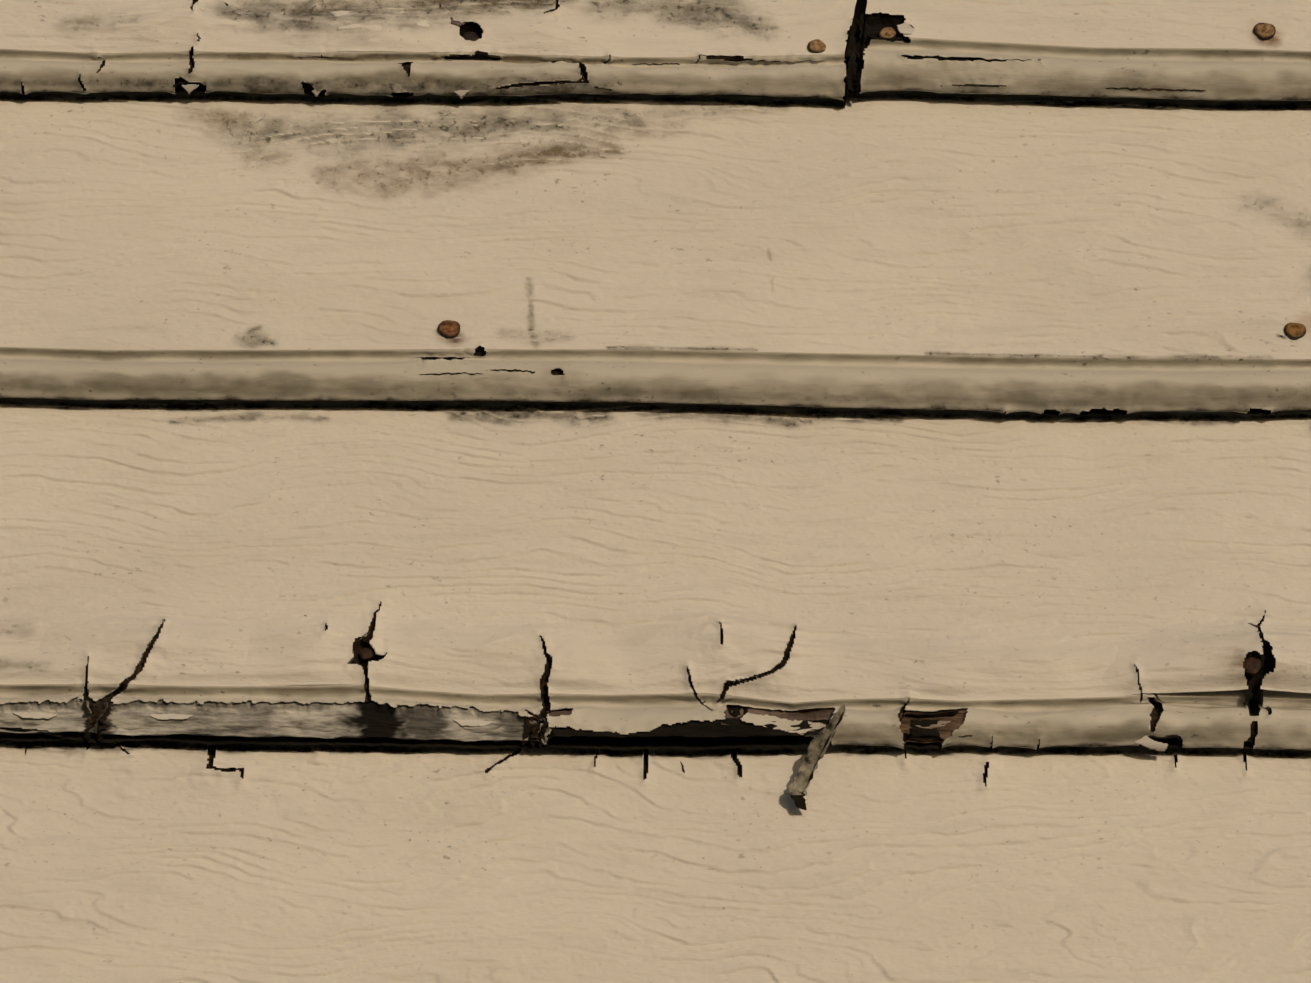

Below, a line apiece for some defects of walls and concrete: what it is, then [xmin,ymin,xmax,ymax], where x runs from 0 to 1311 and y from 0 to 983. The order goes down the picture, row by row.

leakage [223,4,385,29]
leakage [404,0,565,18]
leakage [650,0,735,23]
crack [83,621,165,754]
crack [304,605,387,704]
crack [486,636,572,773]
spalling [522,705,835,745]
crack [687,627,796,711]
spalling [898,698,968,744]
crack [1134,666,1184,768]
crack [1243,612,1276,770]